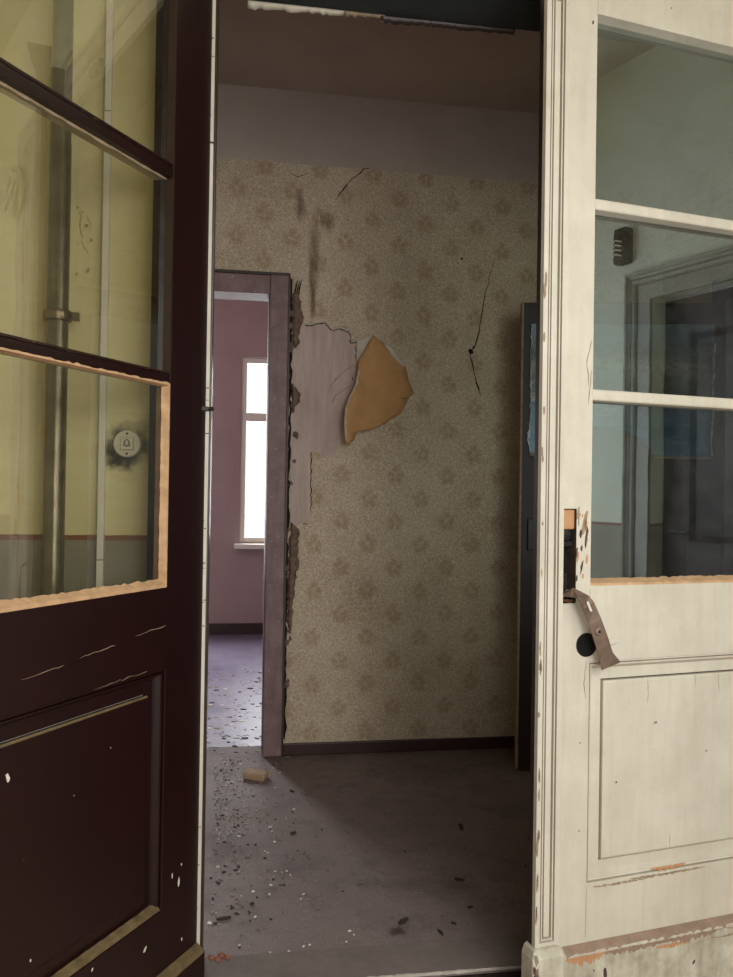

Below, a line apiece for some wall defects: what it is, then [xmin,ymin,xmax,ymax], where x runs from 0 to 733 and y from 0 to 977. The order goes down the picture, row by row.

flaking render [284,279,371,739]
crack [470,259,495,395]